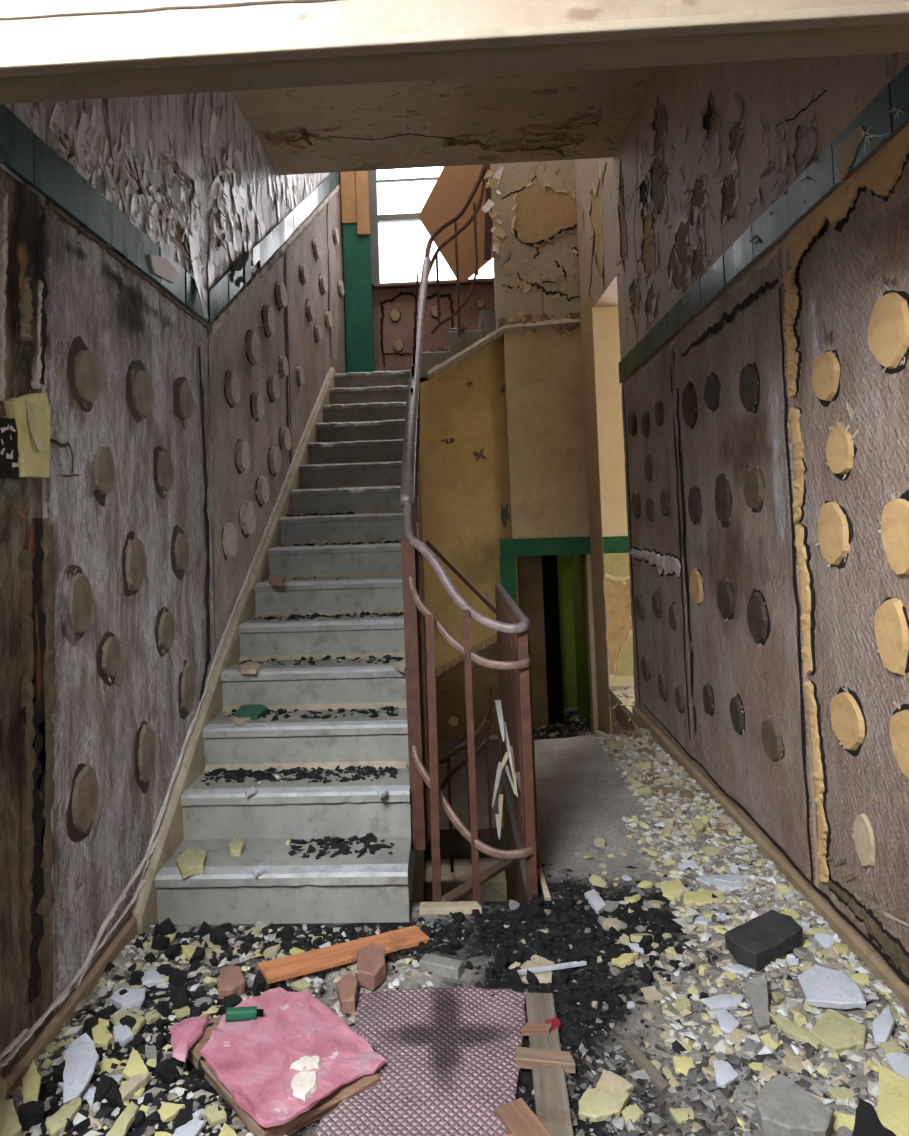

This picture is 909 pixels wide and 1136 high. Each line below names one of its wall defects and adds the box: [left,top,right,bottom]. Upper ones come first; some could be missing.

crack [0,0,334,20]
peeling [49,104,342,290]
crack [328,134,490,146]
spalling [443,91,818,335]
crack [623,278,909,985]